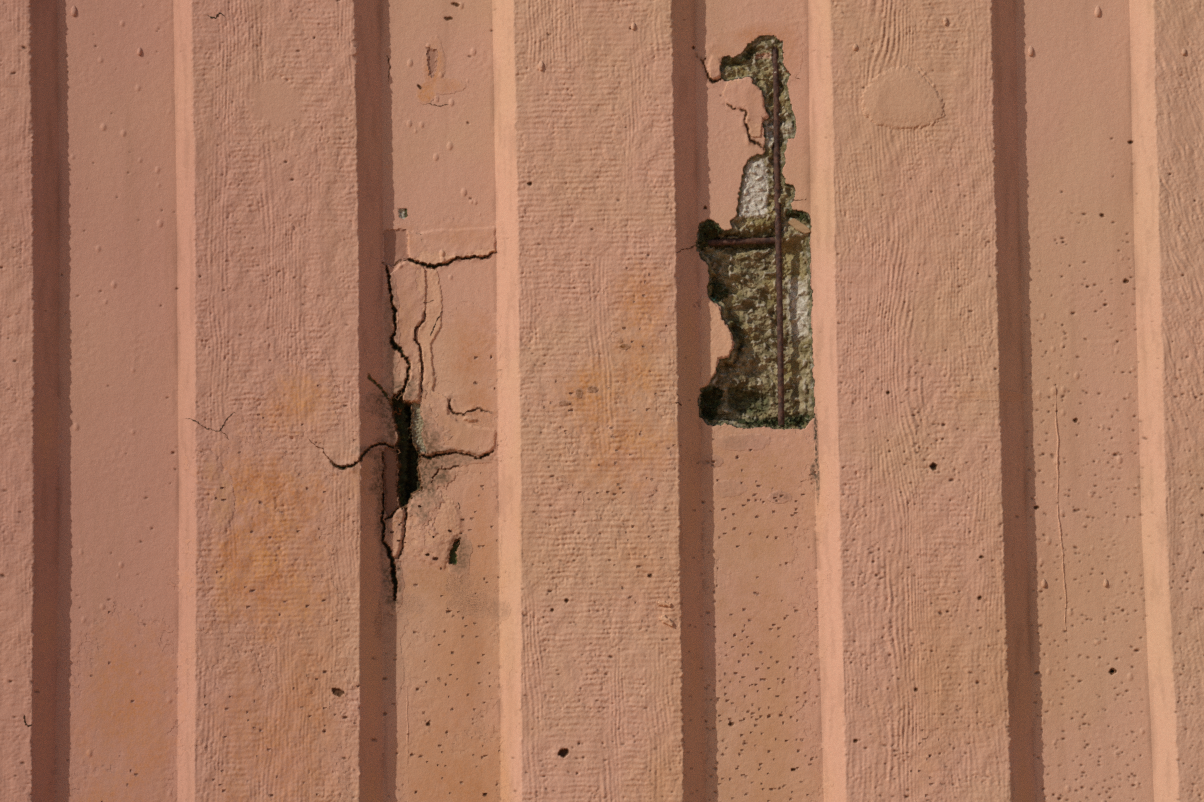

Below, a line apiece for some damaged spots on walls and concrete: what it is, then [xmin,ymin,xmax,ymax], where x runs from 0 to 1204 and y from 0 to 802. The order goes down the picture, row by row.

rust [702,6,805,124]
spalling [695,35,815,430]
crack [309,252,497,601]